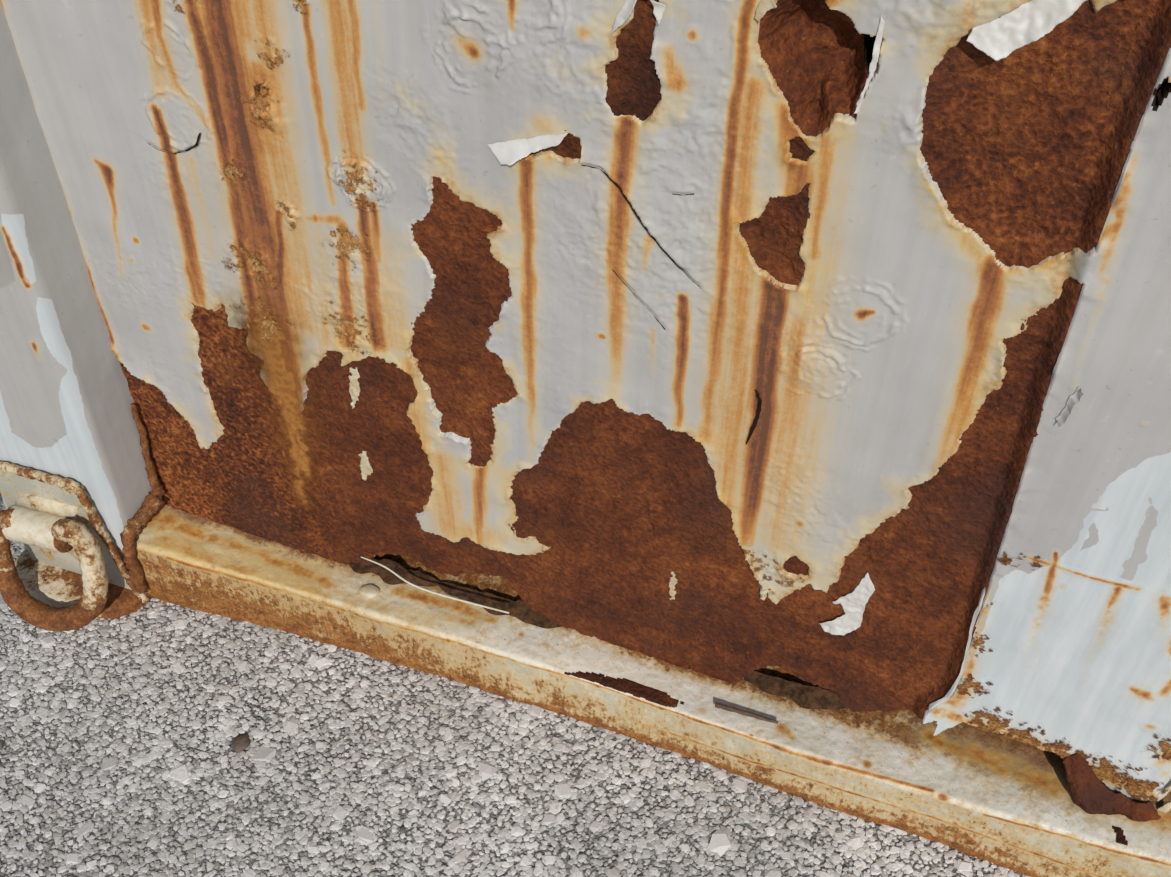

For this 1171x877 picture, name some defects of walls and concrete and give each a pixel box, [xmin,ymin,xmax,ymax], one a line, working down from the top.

peeling [487,133,568,166]
corrosion [81,146,145,286]
crack [582,165,700,287]
peeling [985,448,1171,761]
corrosion [1013,546,1171,714]
corrosion [162,553,957,806]
corrosion [957,674,990,696]
corrosion [968,710,1011,734]
corrosion [1004,728,1041,748]
corrosion [1158,739,1171,761]
corrosion [1091,757,1171,809]
corrosion [975,809,1171,871]